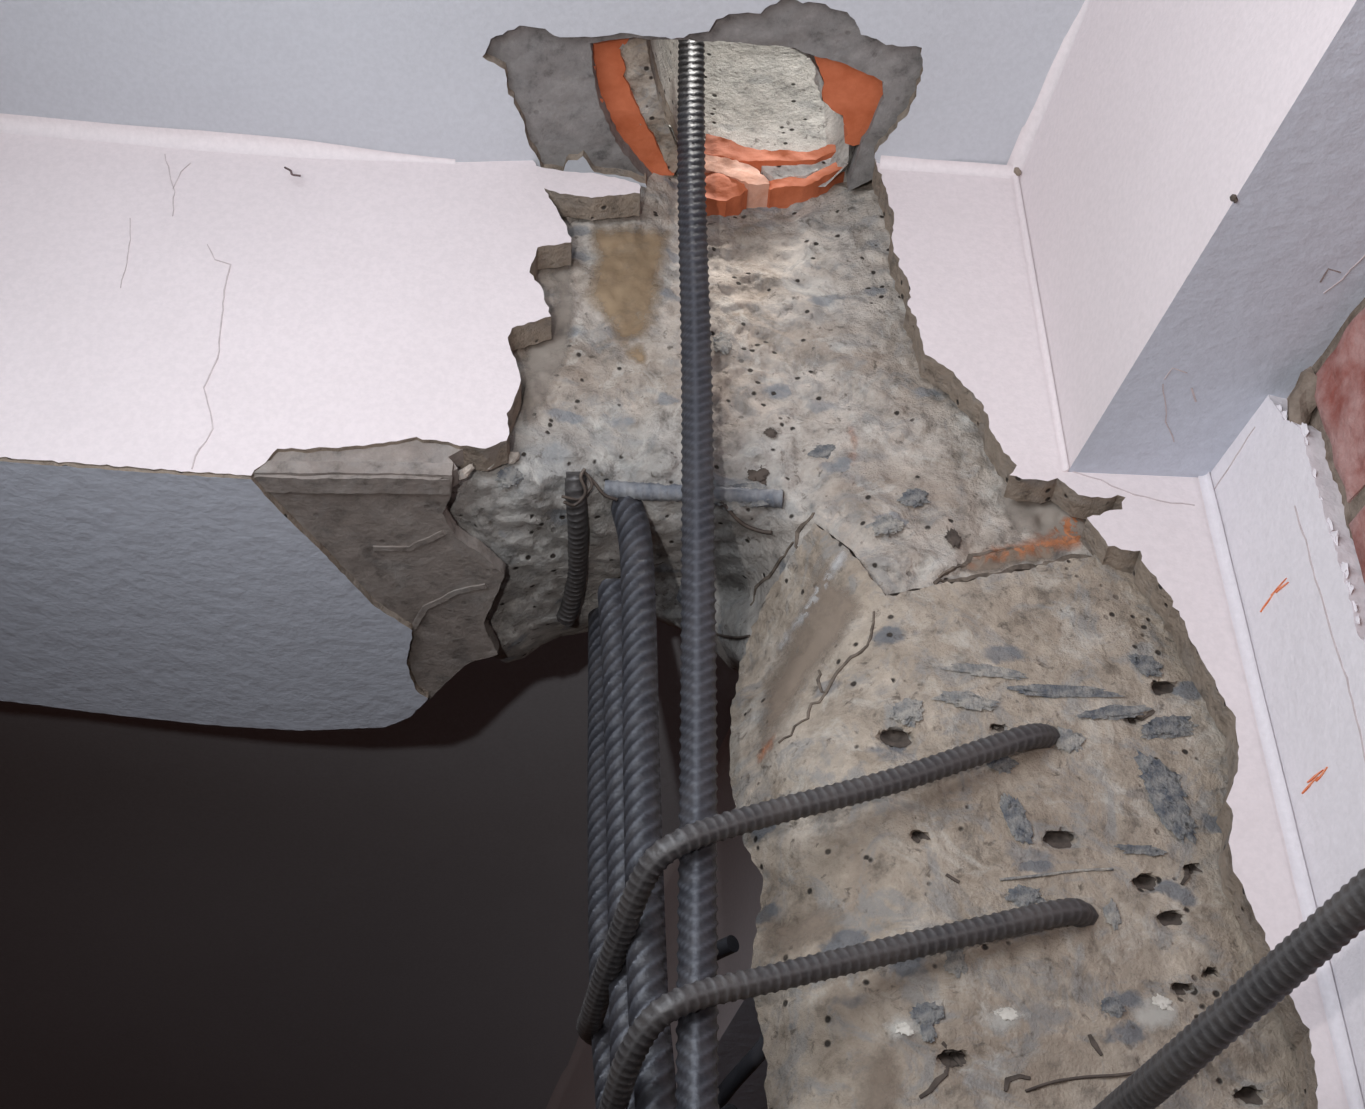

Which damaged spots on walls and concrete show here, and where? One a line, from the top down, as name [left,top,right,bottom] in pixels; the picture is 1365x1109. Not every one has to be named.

crack [165,155,191,216]
crack [120,221,131,288]
crack [191,244,231,469]
water stain [590,229,665,362]
spalling [254,0,1256,1109]
corrosion [961,517,1080,572]
crack [778,611,875,744]
spalling [1155,1008,1304,1109]